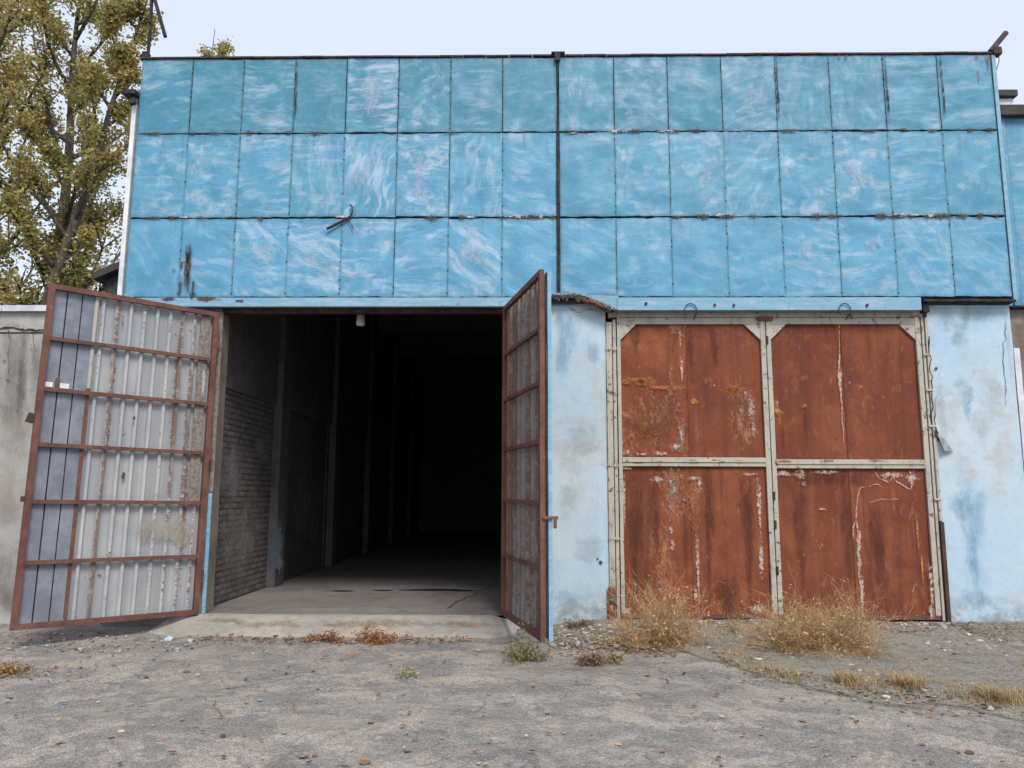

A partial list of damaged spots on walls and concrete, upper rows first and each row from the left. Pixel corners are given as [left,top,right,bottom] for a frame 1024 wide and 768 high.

corrosion [161,245,218,302]
peeling [622,422,685,537]
peeling [650,476,701,510]
peeling [853,472,916,615]